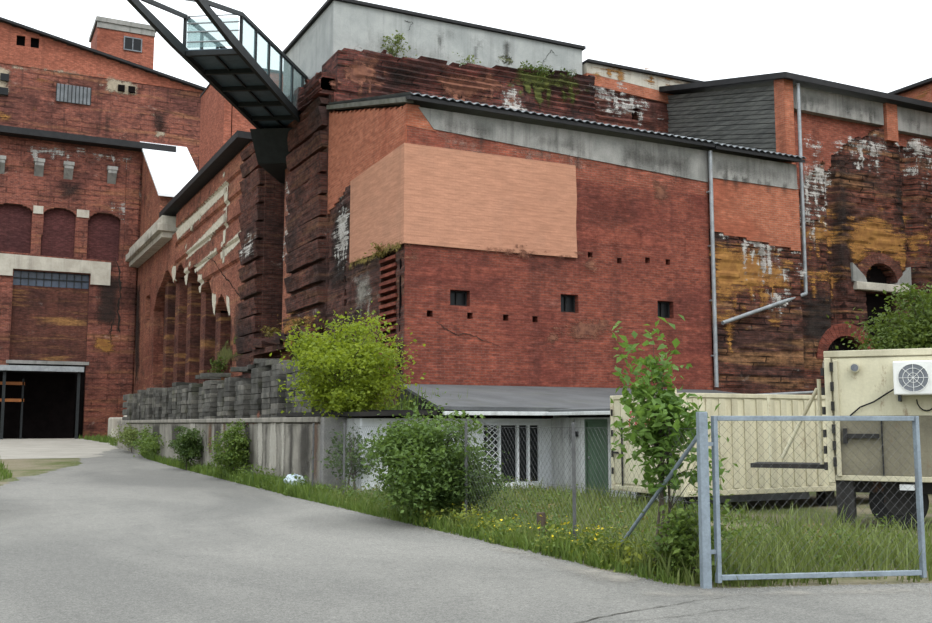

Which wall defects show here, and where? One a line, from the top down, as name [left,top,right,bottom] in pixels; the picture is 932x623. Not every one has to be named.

water stain [594,82,649,125]
water stain [797,136,932,248]
water stain [331,197,350,269]
water stain [719,234,806,314]